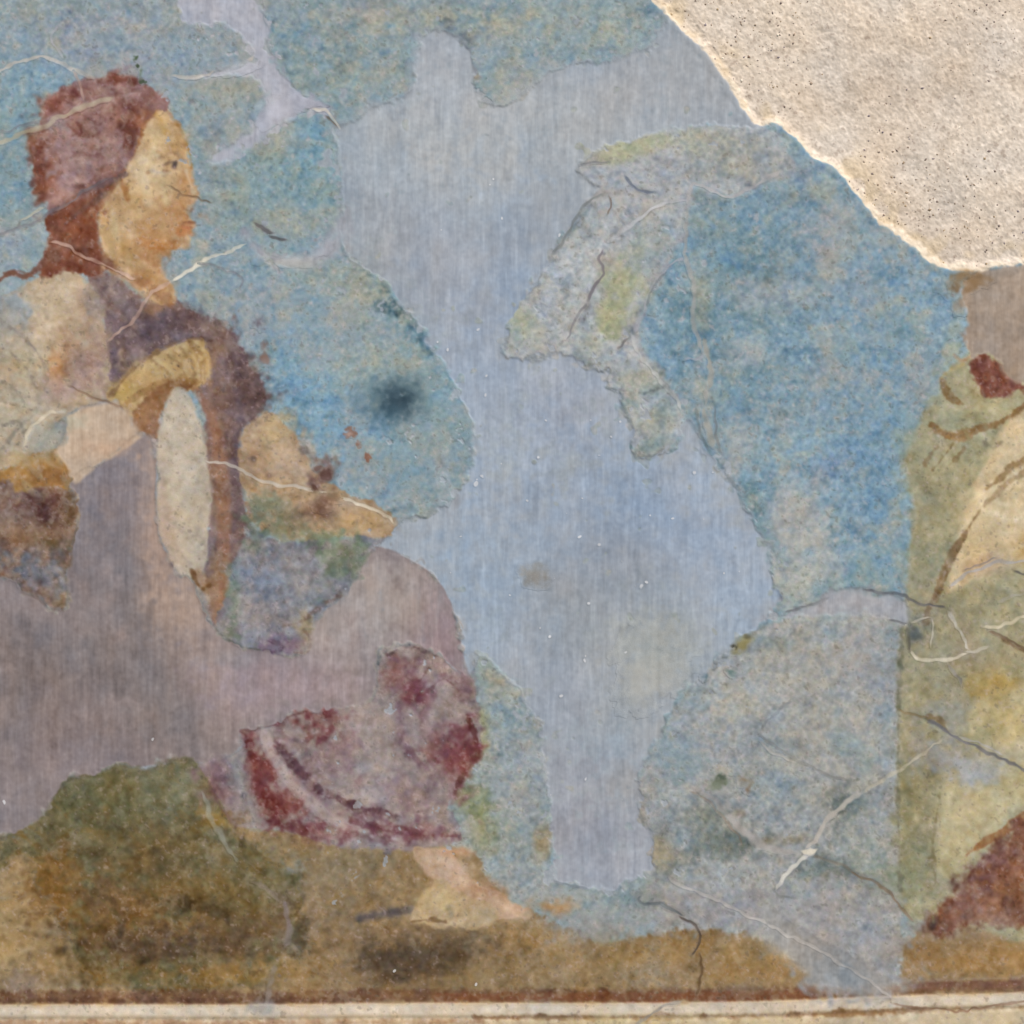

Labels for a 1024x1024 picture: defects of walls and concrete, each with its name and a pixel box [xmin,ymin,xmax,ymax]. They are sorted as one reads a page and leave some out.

crack [0,22,114,145]
crack [311,107,341,130]
crack [0,177,289,343]
crack [22,409,59,447]
crack [68,385,125,410]
crack [205,459,394,524]
damp [336,373,427,440]
flaking render [334,0,1024,892]
flaking render [0,402,470,836]
crack [783,596,831,614]
crack [863,557,1024,687]
crack [635,701,1024,1024]